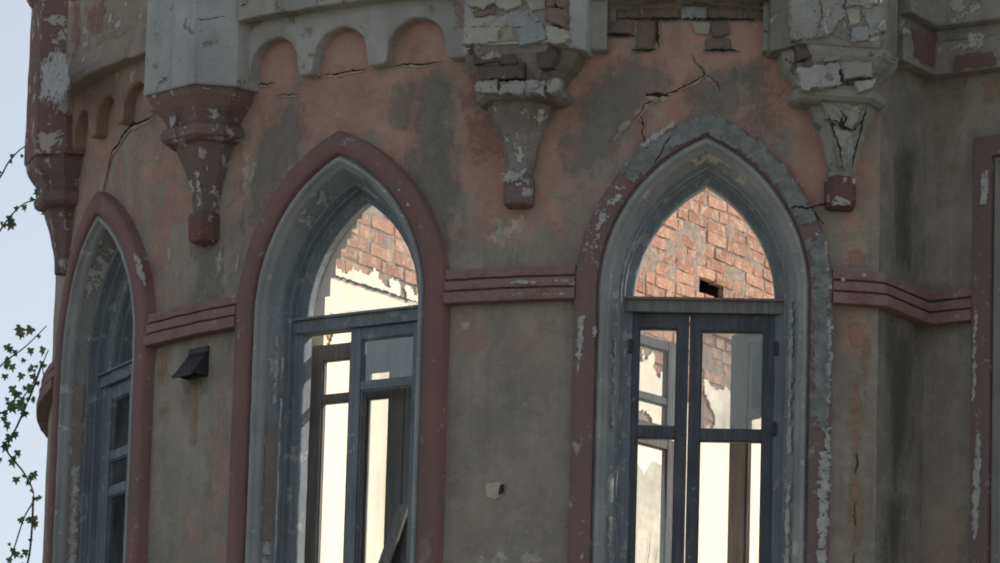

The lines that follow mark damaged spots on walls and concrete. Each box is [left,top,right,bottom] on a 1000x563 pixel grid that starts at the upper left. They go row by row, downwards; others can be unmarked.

peeling [39,44,71,112]
crack [103,75,167,192]
crack [318,69,365,80]
crack [390,60,441,68]
spalling [462,0,573,99]
crack [607,17,763,52]
crack [633,48,738,164]
spalling [787,0,887,184]
peeling [980,170,989,205]
peeling [575,314,598,379]
peeling [582,112,845,563]
peeling [972,430,982,539]